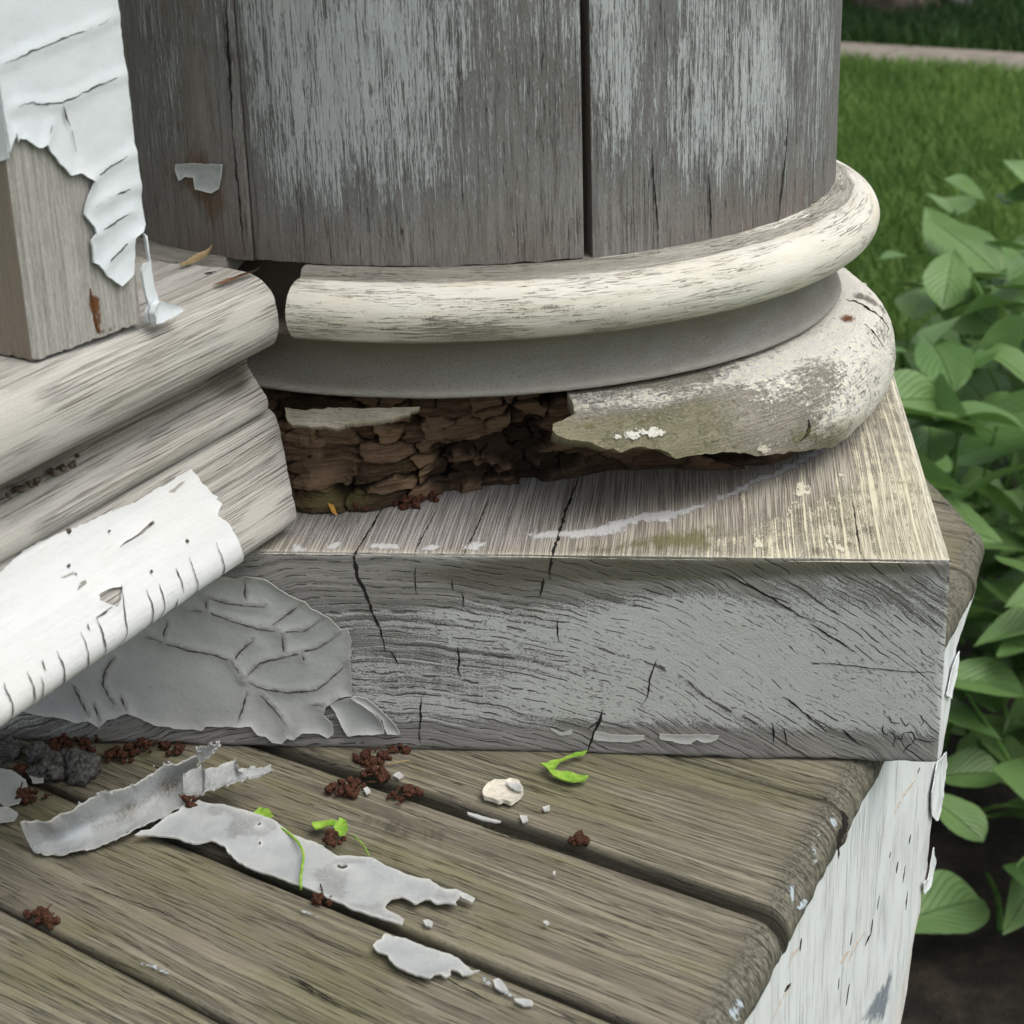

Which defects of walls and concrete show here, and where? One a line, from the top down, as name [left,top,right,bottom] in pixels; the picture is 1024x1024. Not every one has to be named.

peeling [0,0,146,286]
peeling [175,163,223,193]
corrosion [89,288,111,334]
peeling [0,469,400,744]
crack [352,509,398,664]
crack [540,478,579,596]
water stain [525,448,826,539]
crack [587,711,602,754]